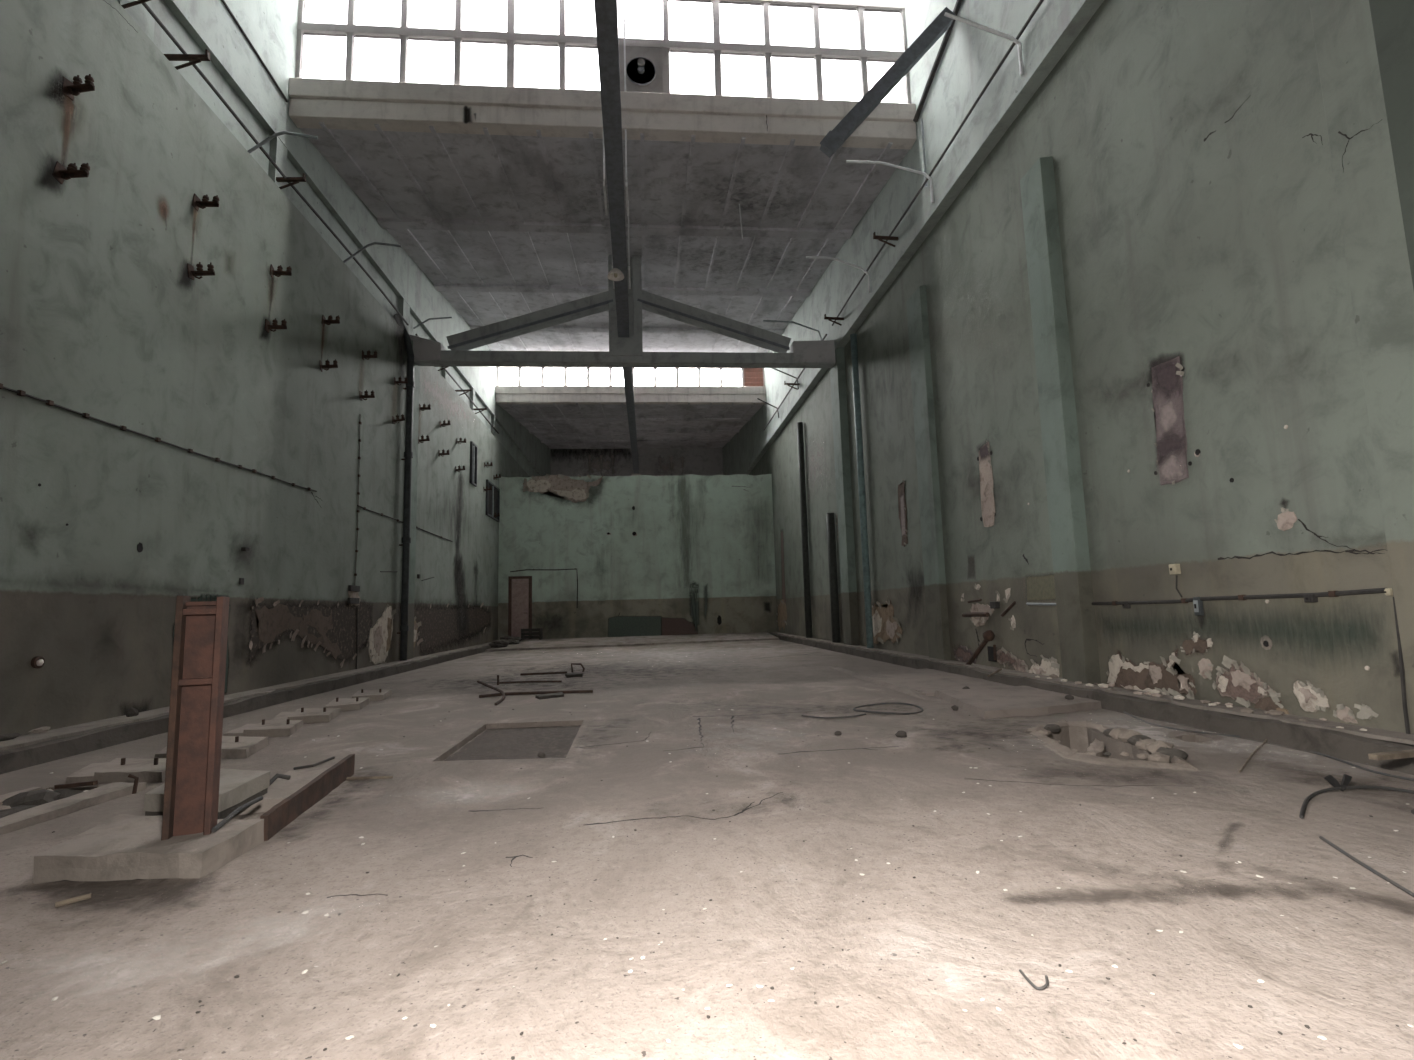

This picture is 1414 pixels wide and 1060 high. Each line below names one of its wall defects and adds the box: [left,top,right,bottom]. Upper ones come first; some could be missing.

peeling [522,473,603,503]
crack [1218,519,1388,560]
peeling [369,604,396,665]
peeling [413,603,491,656]
peeling [872,596,902,644]
peeling [961,584,1016,631]
peeling [996,647,1060,677]
peeling [1106,632,1379,724]